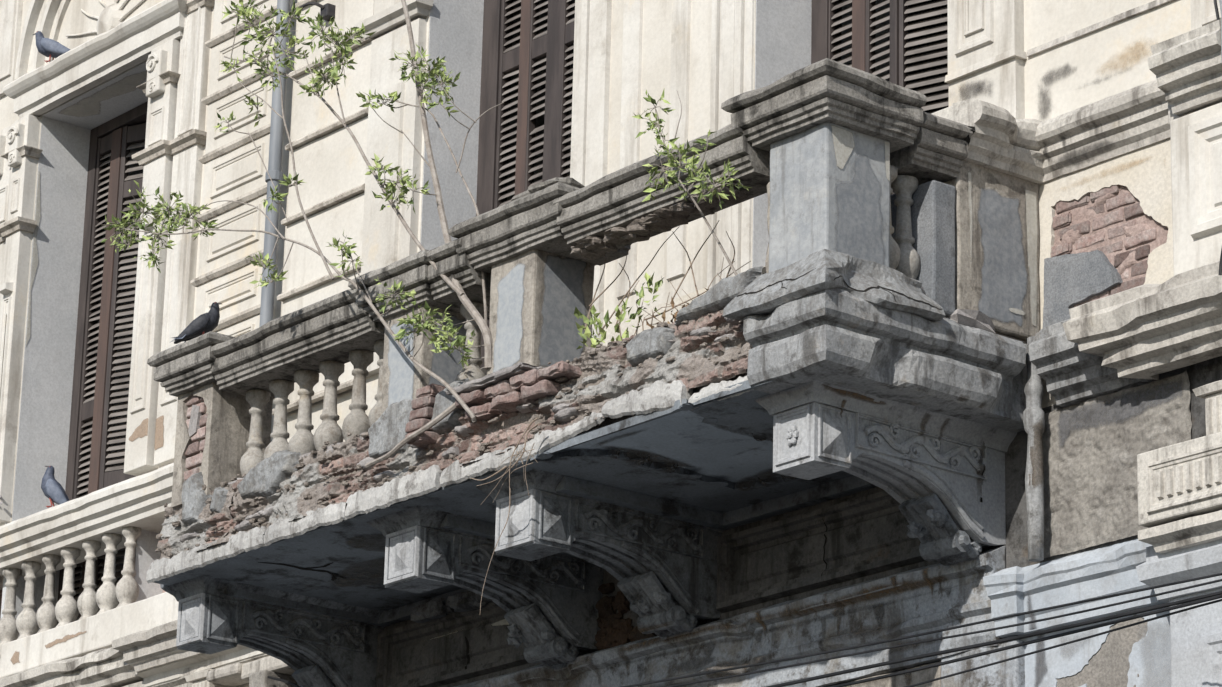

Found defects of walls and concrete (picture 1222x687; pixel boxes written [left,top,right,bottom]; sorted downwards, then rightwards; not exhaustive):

spalling [570,186,748,260]
crack [737,268,939,309]
spalling [1043,185,1168,328]
spalling [129,416,164,450]
spalling [155,309,802,559]
spalling [595,583,657,651]
peeling [1056,617,1148,687]